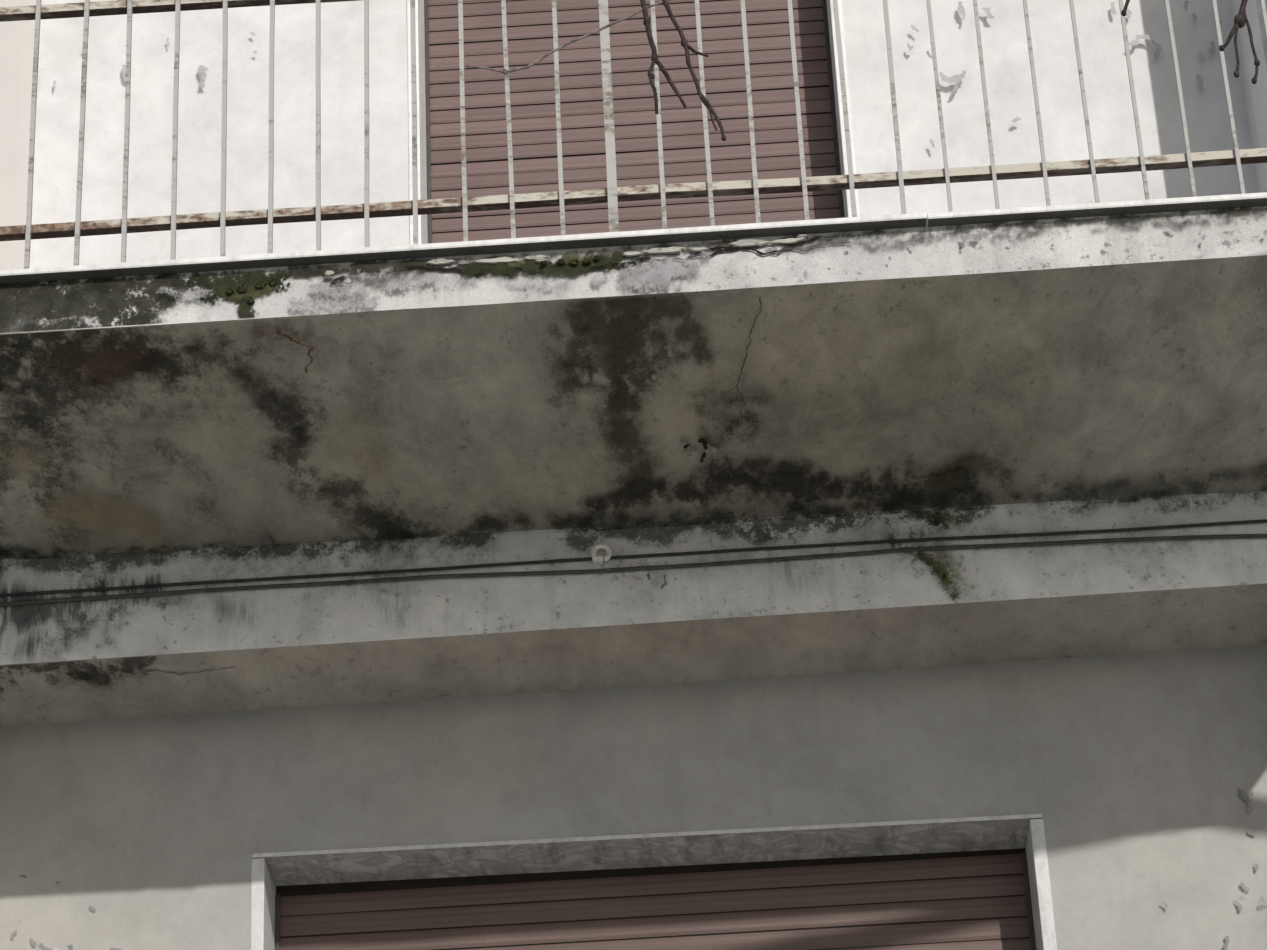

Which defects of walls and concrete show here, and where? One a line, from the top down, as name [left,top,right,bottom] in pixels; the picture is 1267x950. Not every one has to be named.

leakage [0,261,431,534]
leakage [0,367,532,685]
crack [722,297,762,422]
leakage [551,298,991,551]
leakage [1014,466,1267,513]
peeling [11,930,73,950]